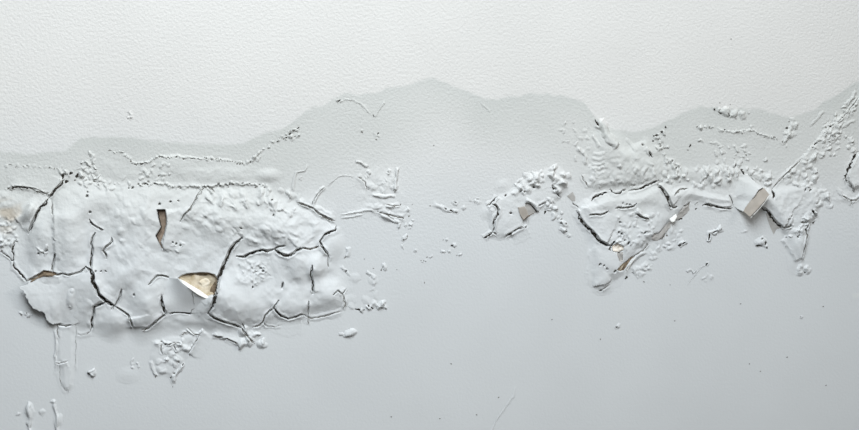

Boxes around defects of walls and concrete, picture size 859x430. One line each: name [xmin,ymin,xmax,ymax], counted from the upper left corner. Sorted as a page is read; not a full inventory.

crack [2,180,346,391]
peeling [0,158,387,352]
crack [484,196,524,238]
crack [539,176,733,256]
peeling [479,160,834,296]
crack [762,160,816,252]
crack [843,154,859,206]